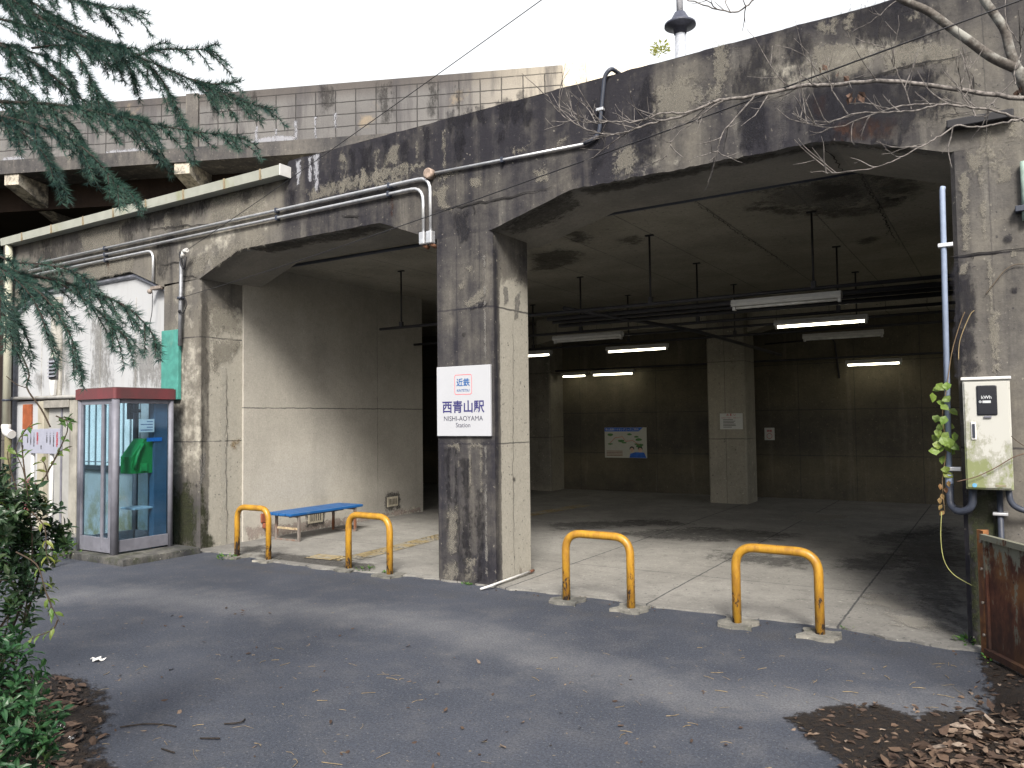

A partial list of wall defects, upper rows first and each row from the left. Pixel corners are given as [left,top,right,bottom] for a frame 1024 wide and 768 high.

damp [848,0,939,49]
damp [240,94,297,143]
damp [442,90,532,162]
damp [589,35,952,194]
damp [289,127,429,206]
damp [959,172,986,250]
damp [951,264,977,377]
damp [446,443,488,580]